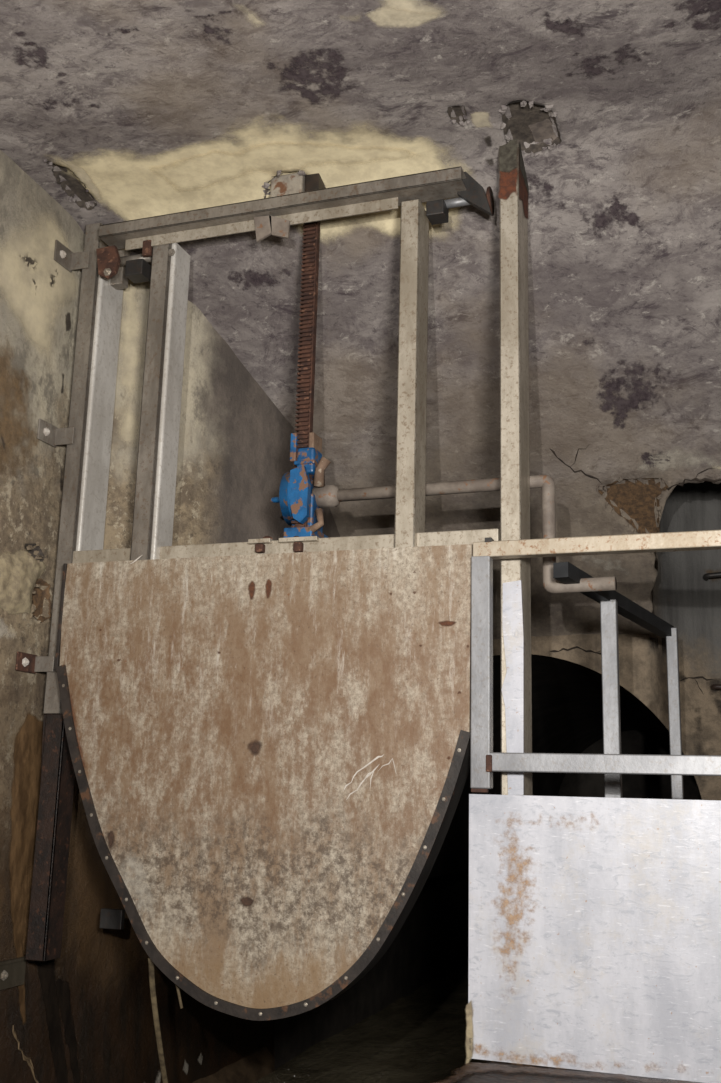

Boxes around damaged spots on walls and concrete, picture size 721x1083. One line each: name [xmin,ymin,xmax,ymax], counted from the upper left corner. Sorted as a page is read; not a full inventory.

mould [268,49,355,104]
spalling [499,100,562,158]
spalling [43,159,101,210]
mould [584,196,641,237]
damp [0,351,37,468]
mould [598,361,670,429]
crack [550,446,602,484]
spalling [596,476,673,534]
rust [500,840,530,968]
crack [12,1025,39,1083]